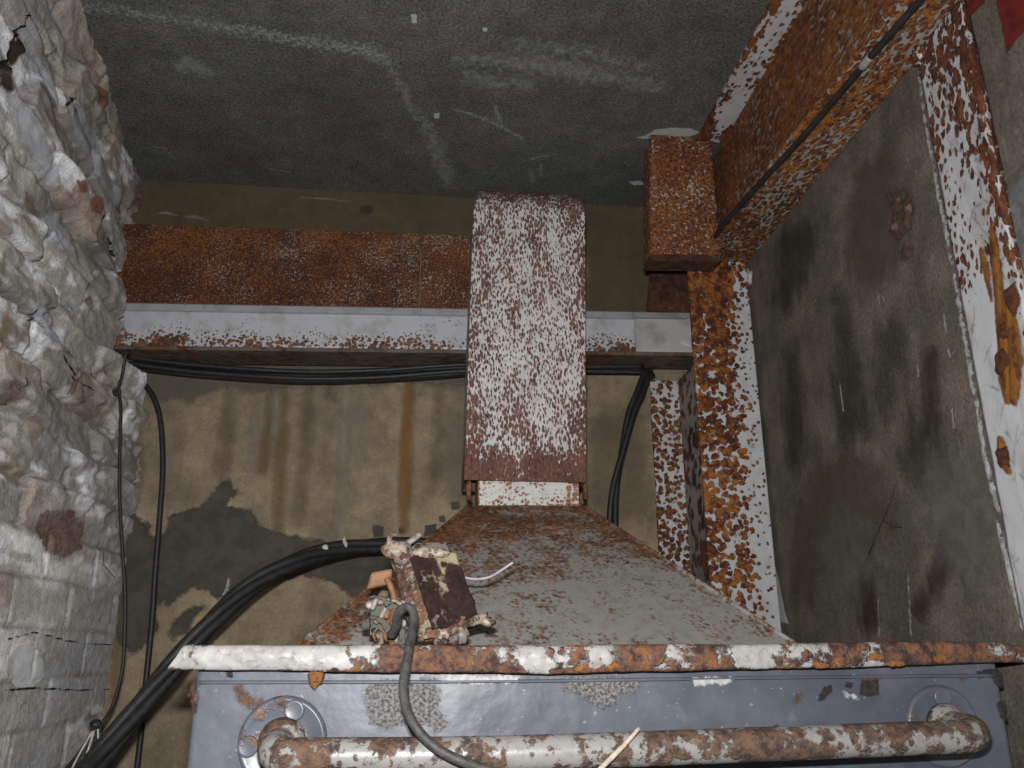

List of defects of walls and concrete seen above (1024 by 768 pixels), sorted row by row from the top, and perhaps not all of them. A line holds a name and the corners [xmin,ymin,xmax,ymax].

corrosion [979,223,1024,405]
peeling [917,71,1023,630]
corrosion [995,436,1012,474]
damp [116,480,327,653]
damp [273,553,392,596]
corrosion [575,658,619,673]
corrosion [869,653,906,667]